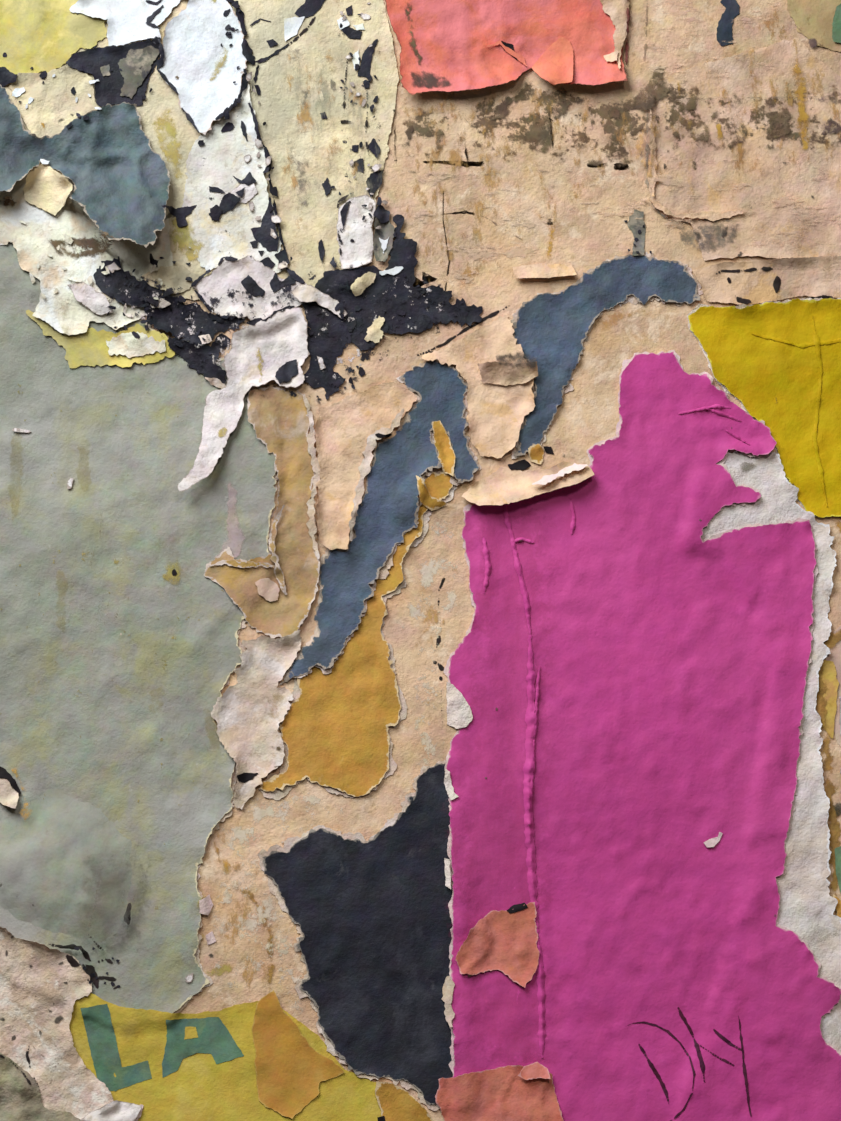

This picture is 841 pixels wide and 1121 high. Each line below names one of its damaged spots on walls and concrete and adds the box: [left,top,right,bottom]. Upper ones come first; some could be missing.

peeling [29,0,483,403]
leakage [403,46,841,283]
peeling [704,832,723,847]